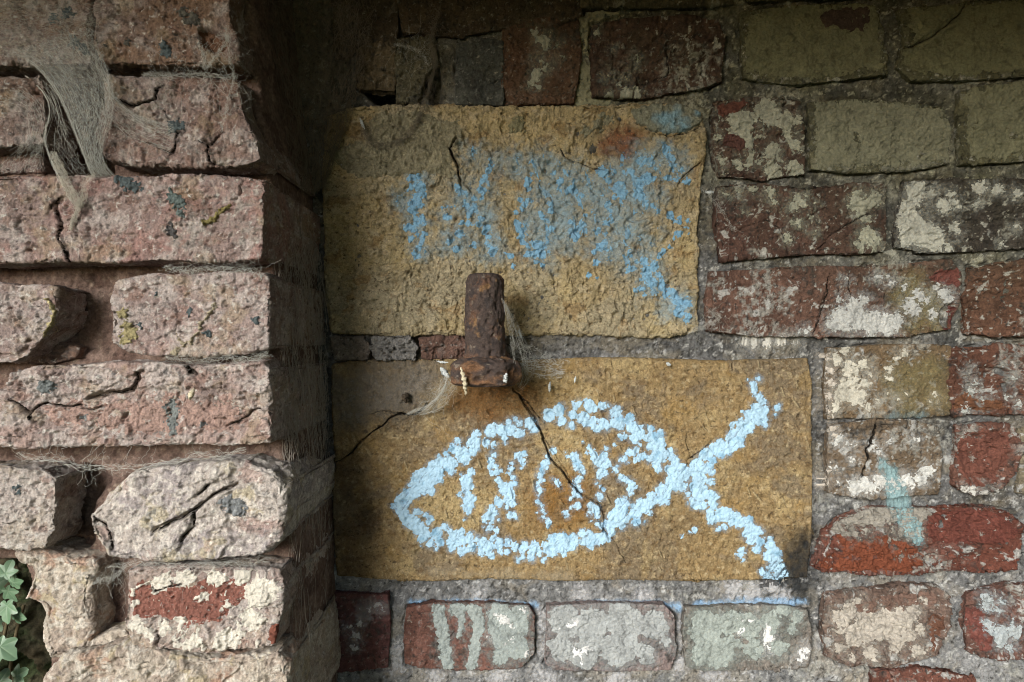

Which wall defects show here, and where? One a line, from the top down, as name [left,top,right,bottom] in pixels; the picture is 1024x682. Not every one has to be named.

crack [50,197,71,263]
crack [8,372,139,420]
crack [336,405,426,462]
crack [514,391,626,563]
crack [861,424,877,477]
crack [152,485,235,542]
peeling [127,566,285,652]